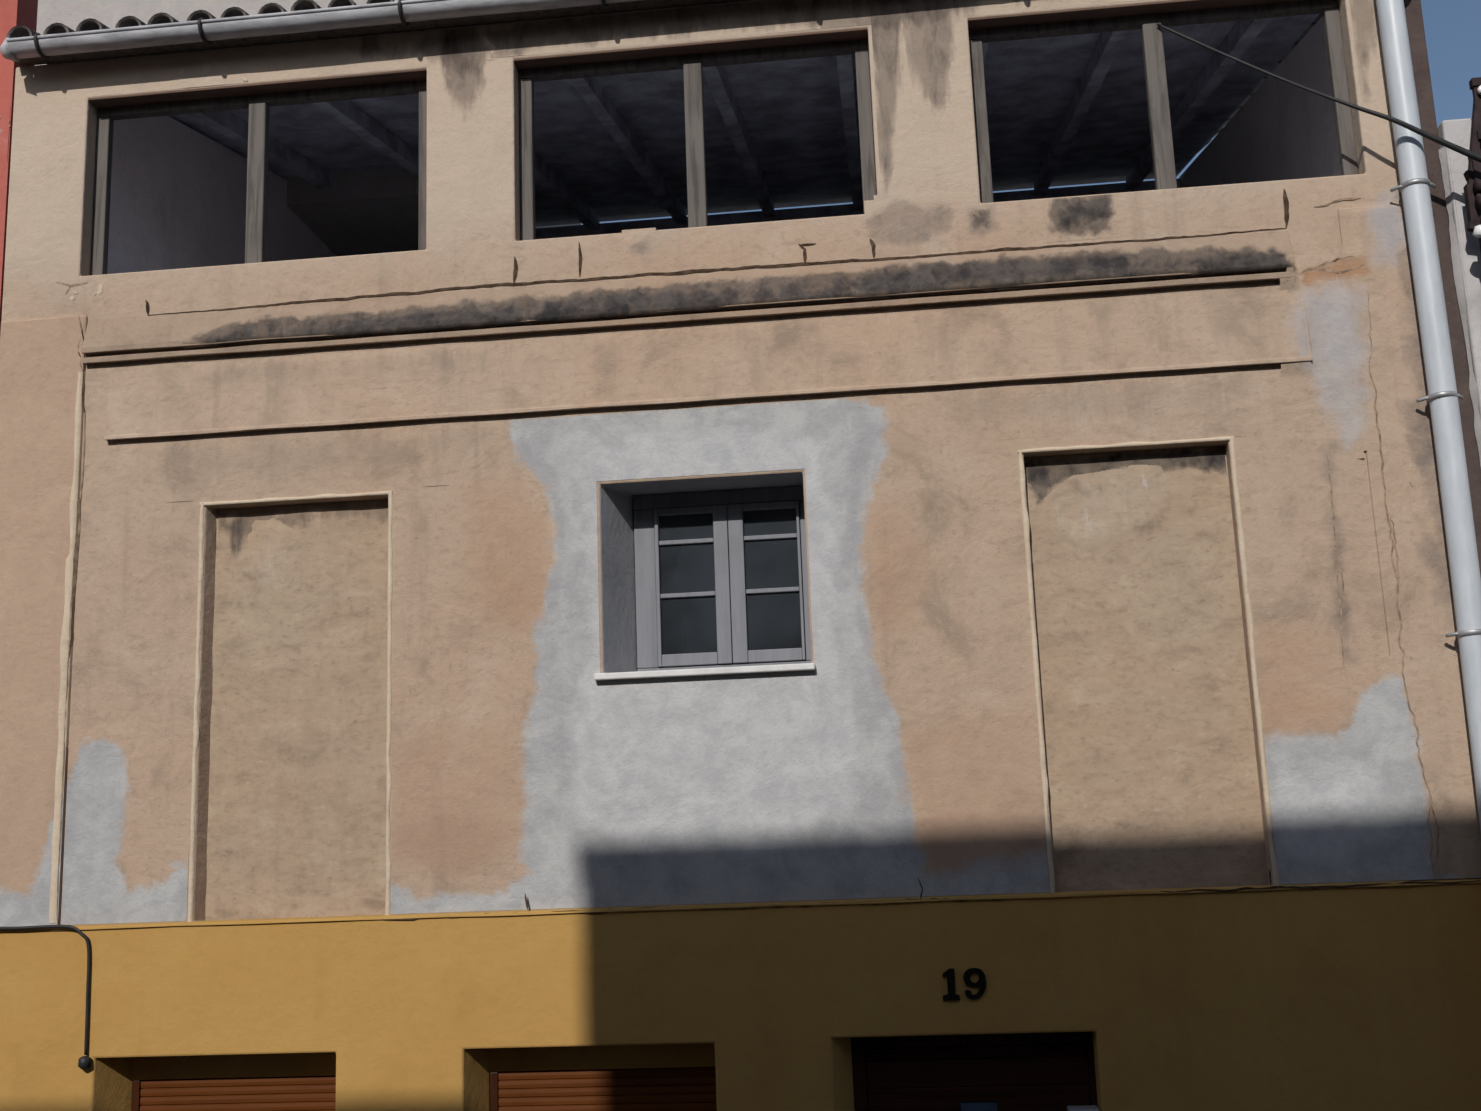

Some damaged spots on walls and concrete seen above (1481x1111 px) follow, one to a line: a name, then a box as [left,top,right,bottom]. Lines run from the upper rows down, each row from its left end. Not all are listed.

leakage [132,0,1293,660]
crack [1161,256,1481,892]
leakage [1349,0,1386,111]